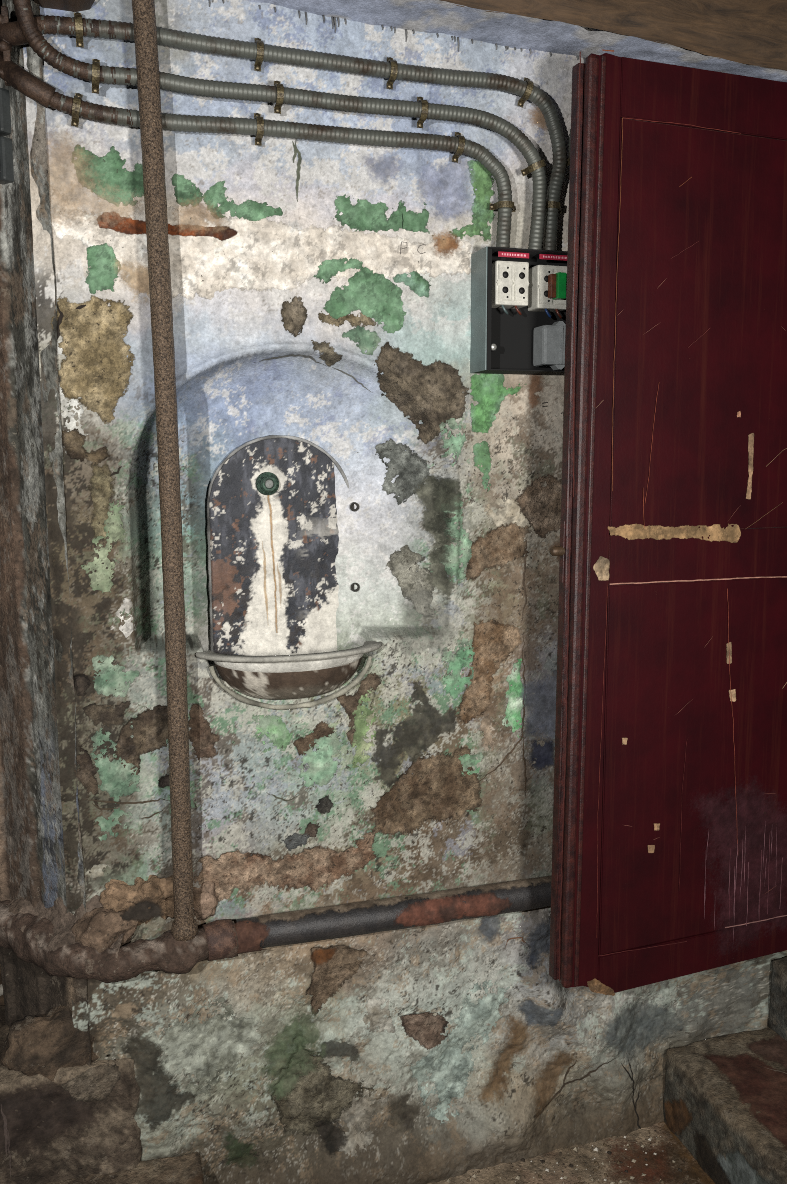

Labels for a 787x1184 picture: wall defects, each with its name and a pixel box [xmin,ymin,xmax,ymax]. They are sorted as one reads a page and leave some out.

rust [97,212,146,235]
rust [168,224,237,241]
peeling [172,174,283,221]
peeling [334,194,433,236]
flaking render [51,243,135,424]
flaking render [281,258,562,617]
damp [427,476,461,563]
flaking render [194,673,483,902]
rust [234,920,270,954]
rust [311,949,335,964]
damp [122,1037,195,1130]
crack [530,1053,641,1129]